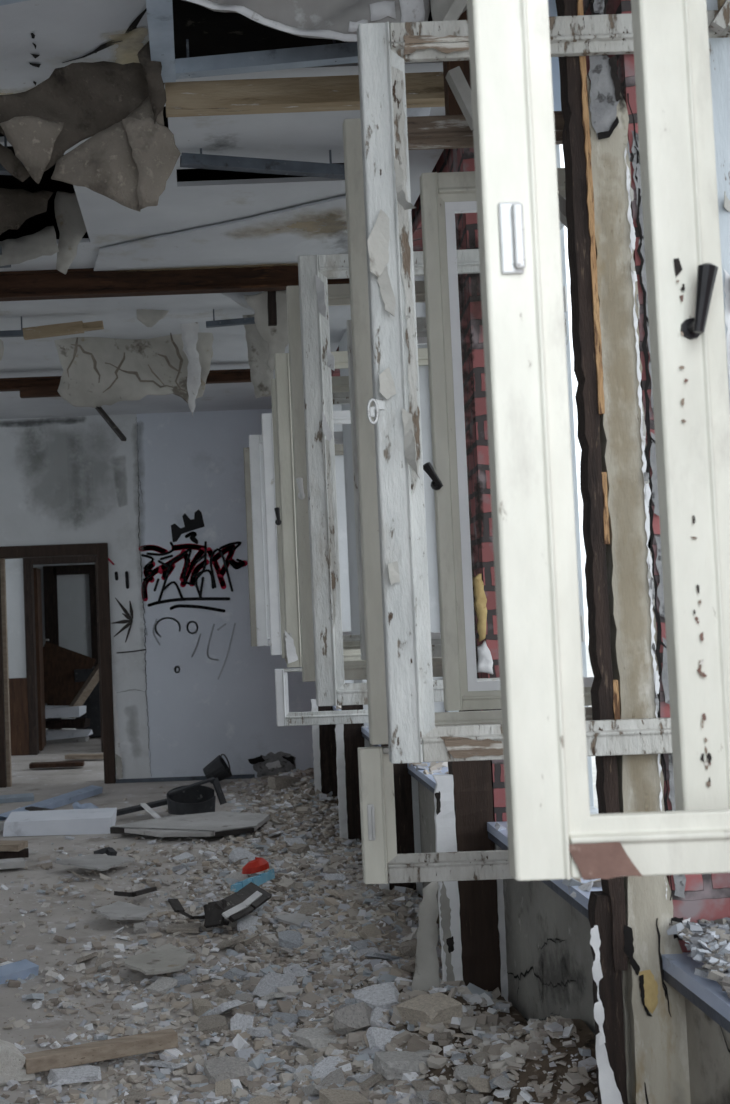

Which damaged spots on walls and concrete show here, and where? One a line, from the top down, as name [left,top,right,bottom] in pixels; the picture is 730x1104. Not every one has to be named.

peeling [348,0,425,32]
peeling [403,35,469,55]
peeling [367,66,421,494]
crack [67,333,188,393]
peeling [440,736,504,759]